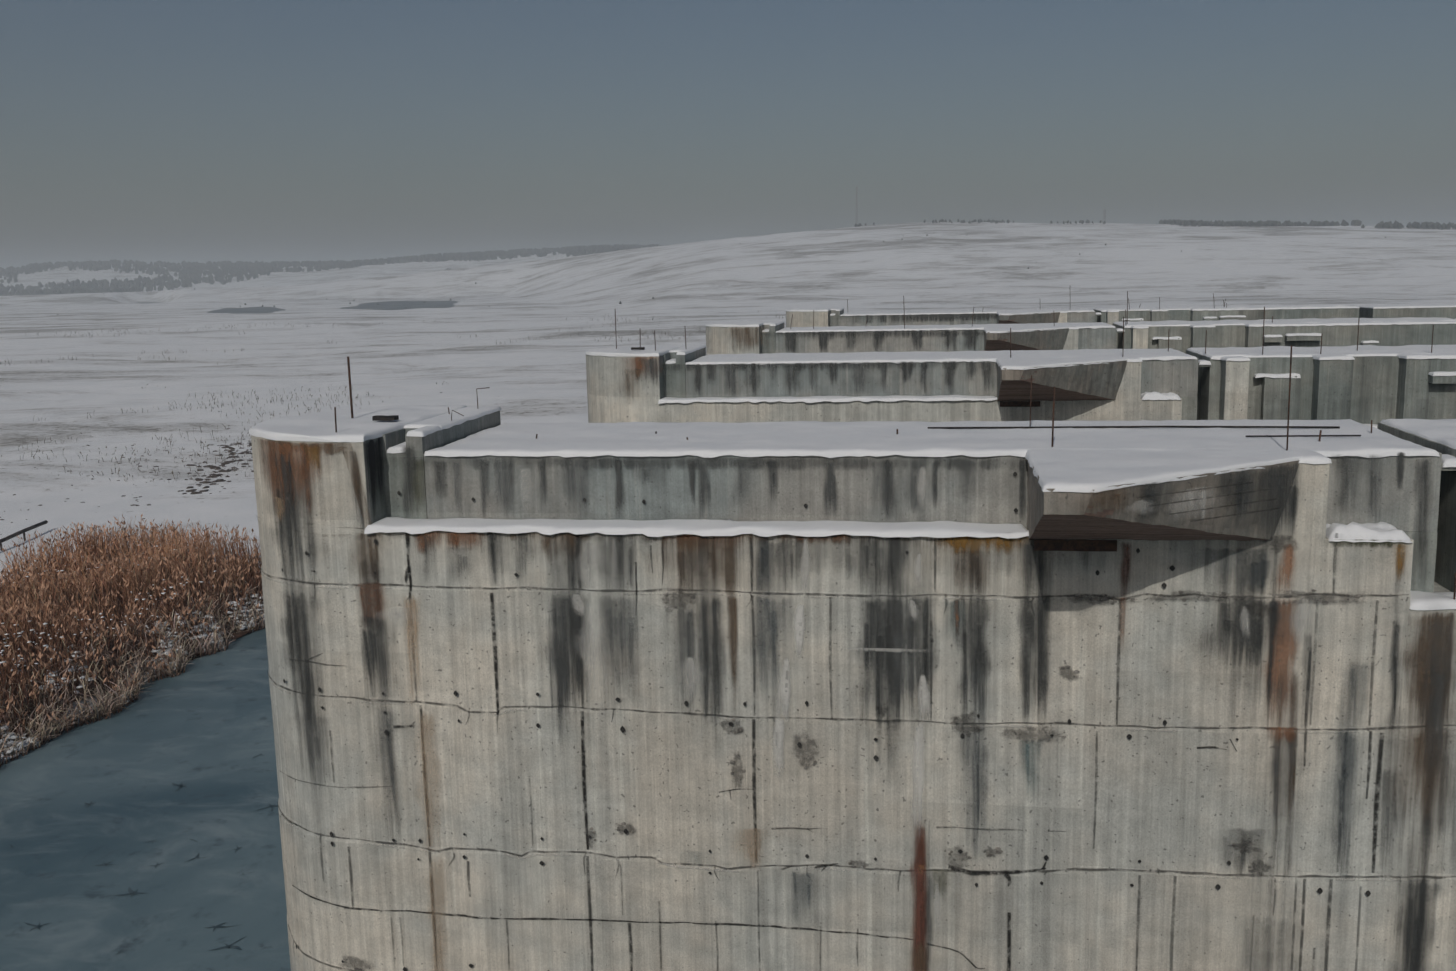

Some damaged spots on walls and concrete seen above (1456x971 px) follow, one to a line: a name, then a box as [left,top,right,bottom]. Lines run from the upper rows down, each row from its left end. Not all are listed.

water stain [562,457,645,509]
water stain [667,457,803,506]
water stain [824,458,867,509]
water stain [884,460,893,513]
rust [1279,544,1293,582]
water stain [286,594,314,713]
water stain [554,535,585,707]
water stain [688,569,736,702]
water stain [865,600,932,817]
water stain [1022,595,1049,709]
rust [1267,601,1296,708]
rust [914,828,927,971]